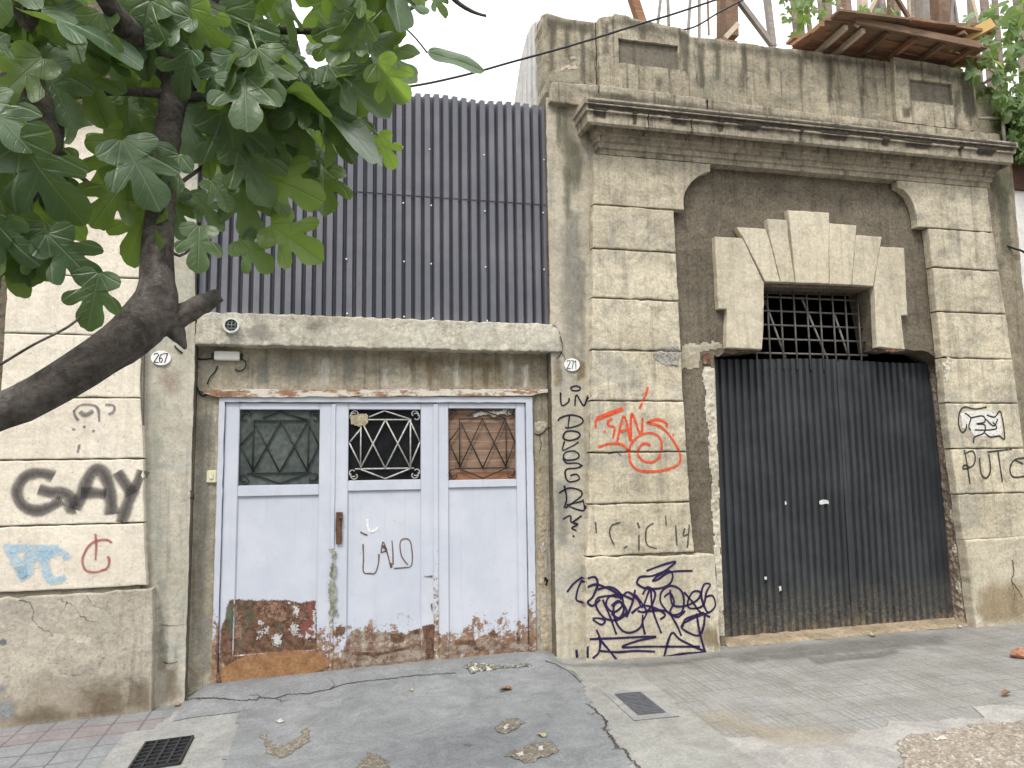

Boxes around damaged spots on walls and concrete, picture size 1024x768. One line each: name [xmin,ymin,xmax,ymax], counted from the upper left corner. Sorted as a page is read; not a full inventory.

damp [593,93,861,141]
damp [606,19,865,101]
damp [896,66,977,117]
rust [215,599,539,682]
crack [185,672,454,701]
crack [547,661,641,768]